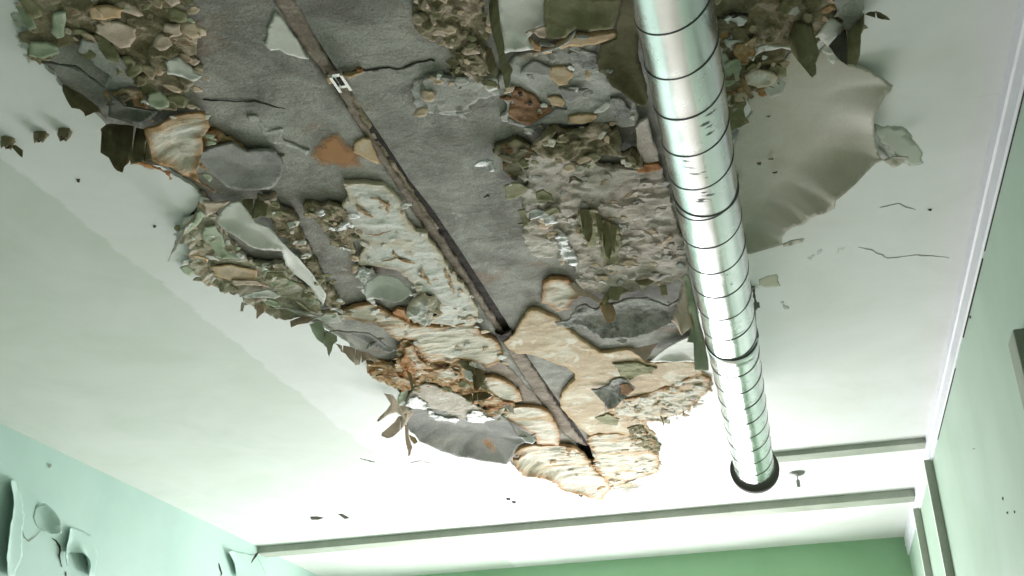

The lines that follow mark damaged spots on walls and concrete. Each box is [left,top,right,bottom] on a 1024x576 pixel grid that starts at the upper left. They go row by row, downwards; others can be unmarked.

flaking render [714,0,868,112]
spalling [16,0,698,464]
crack [859,247,947,259]
spalling [550,374,713,490]
peeling [6,479,98,576]